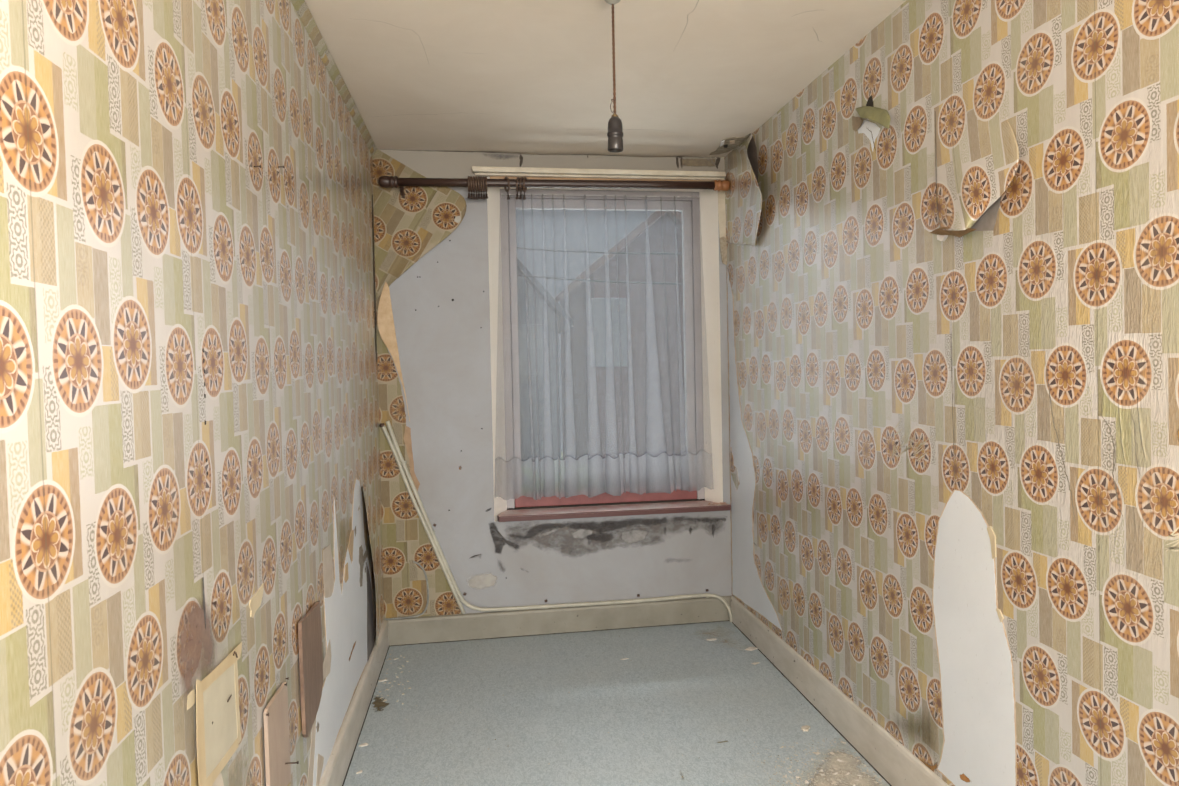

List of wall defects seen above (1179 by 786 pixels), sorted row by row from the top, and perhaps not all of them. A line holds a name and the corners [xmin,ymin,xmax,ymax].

flaking render [971,195,1002,231]
peeling [312,478,374,786]
damp [471,517,724,588]
peeling [932,489,1017,786]